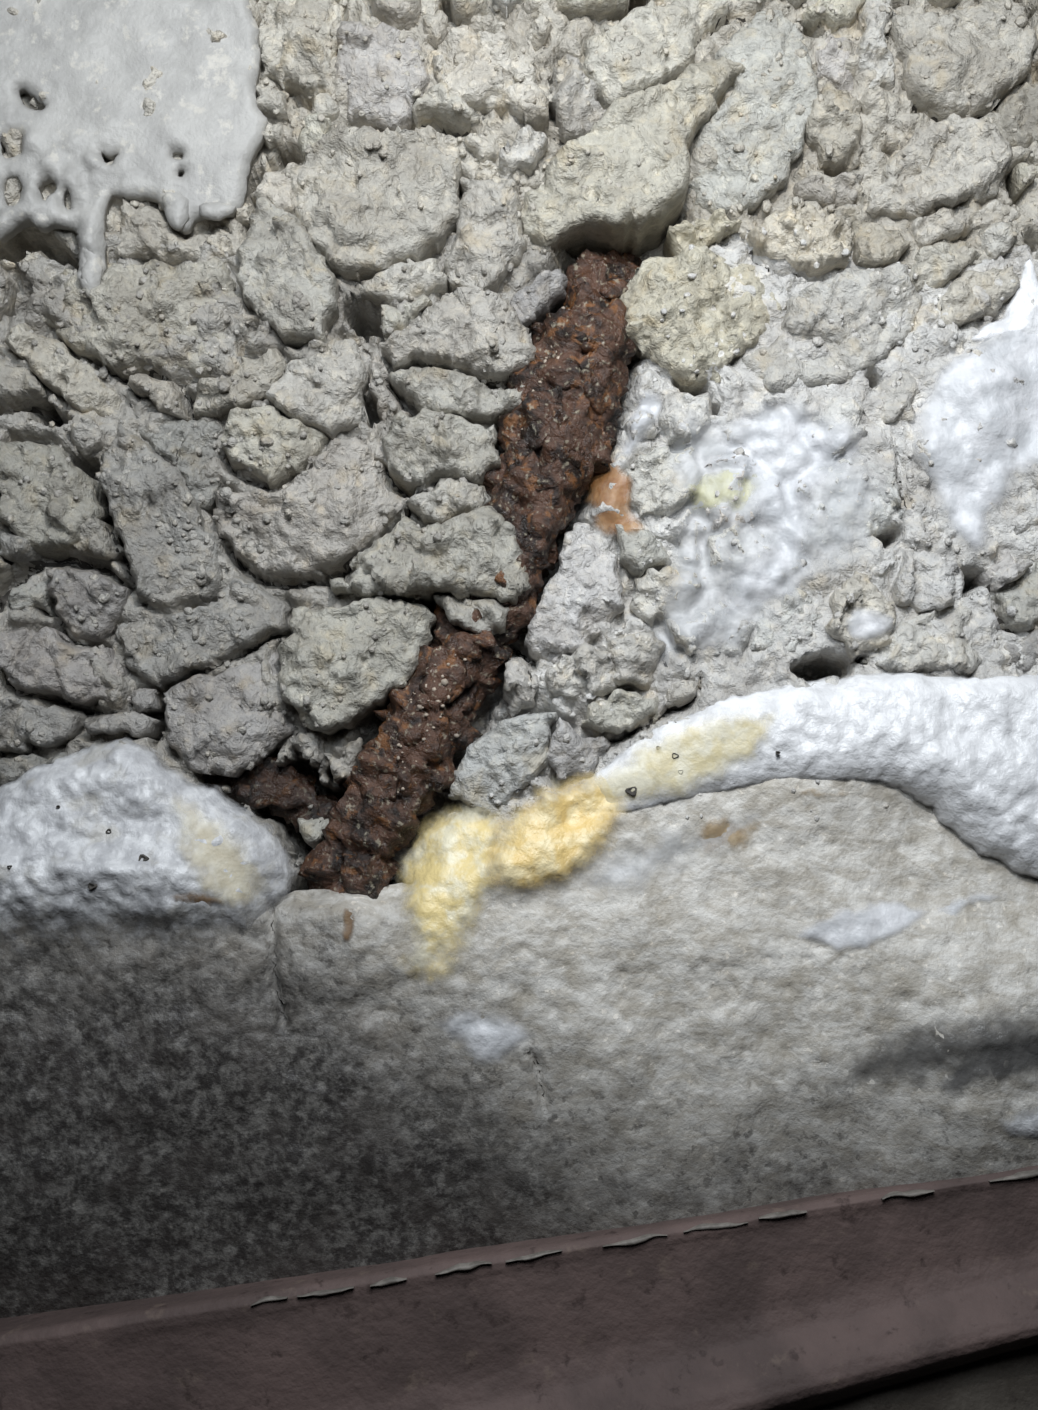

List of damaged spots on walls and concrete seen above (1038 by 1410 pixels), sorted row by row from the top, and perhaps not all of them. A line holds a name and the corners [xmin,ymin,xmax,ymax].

crack [12,407,61,427]
crack [0,497,136,646]
crack [108,370,195,465]
crack [228,461,312,492]
crack [232,543,373,590]
crack [387,471,437,518]
spalling [0,0,1038,896]
corrosion [590,463,639,531]
efflorescence [625,393,660,452]
efflorescence [661,406,872,648]
efflorescence [921,259,1038,541]
corrosion [405,778,617,968]